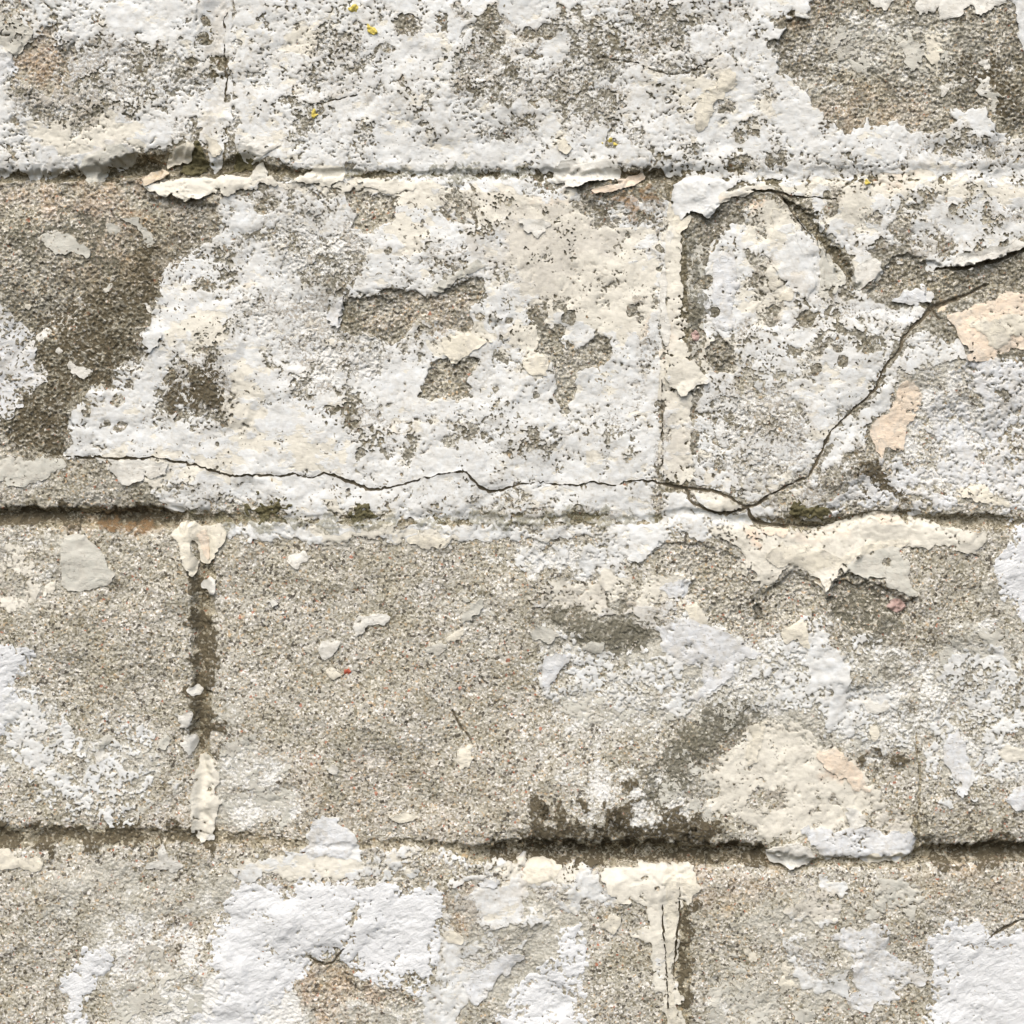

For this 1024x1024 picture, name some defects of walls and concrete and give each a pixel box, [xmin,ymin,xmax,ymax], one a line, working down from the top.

crack [752,189,836,236]
crack [65,247,1024,528]
damp [178,573,228,760]
peeling [353,614,391,637]
peeling [533,641,649,734]
damp [515,696,772,861]
peeling [918,625,1024,811]
peeling [993,517,1024,623]
peeling [0,848,43,872]
peeling [52,946,114,1024]
peeling [107,815,701,1024]
peeling [708,874,1024,1024]